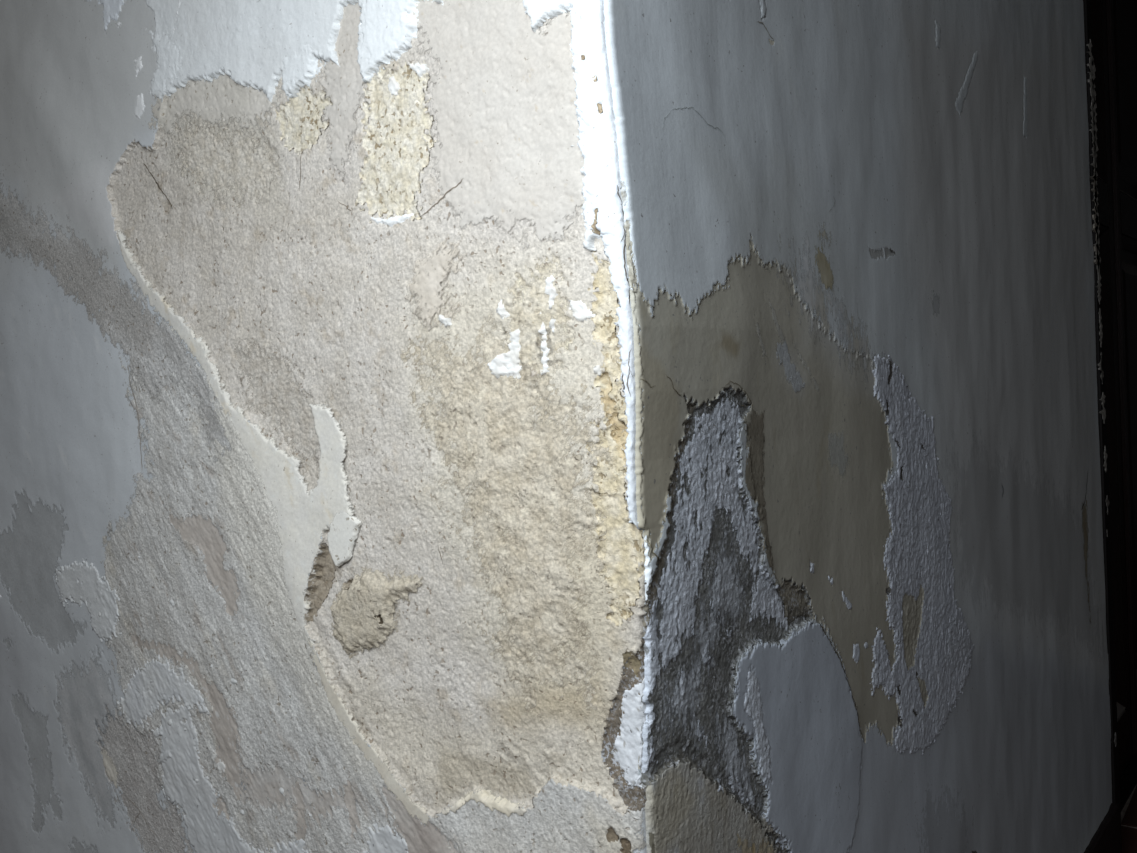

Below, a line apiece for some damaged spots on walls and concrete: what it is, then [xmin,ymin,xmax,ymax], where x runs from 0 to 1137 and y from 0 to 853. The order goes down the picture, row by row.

peeling [11,690,63,833]
peeling [0,490,87,654]
water stain [0,175,232,463]
spalling [53,0,652,853]
spalling [428,386,813,853]
peeling [629,233,971,853]